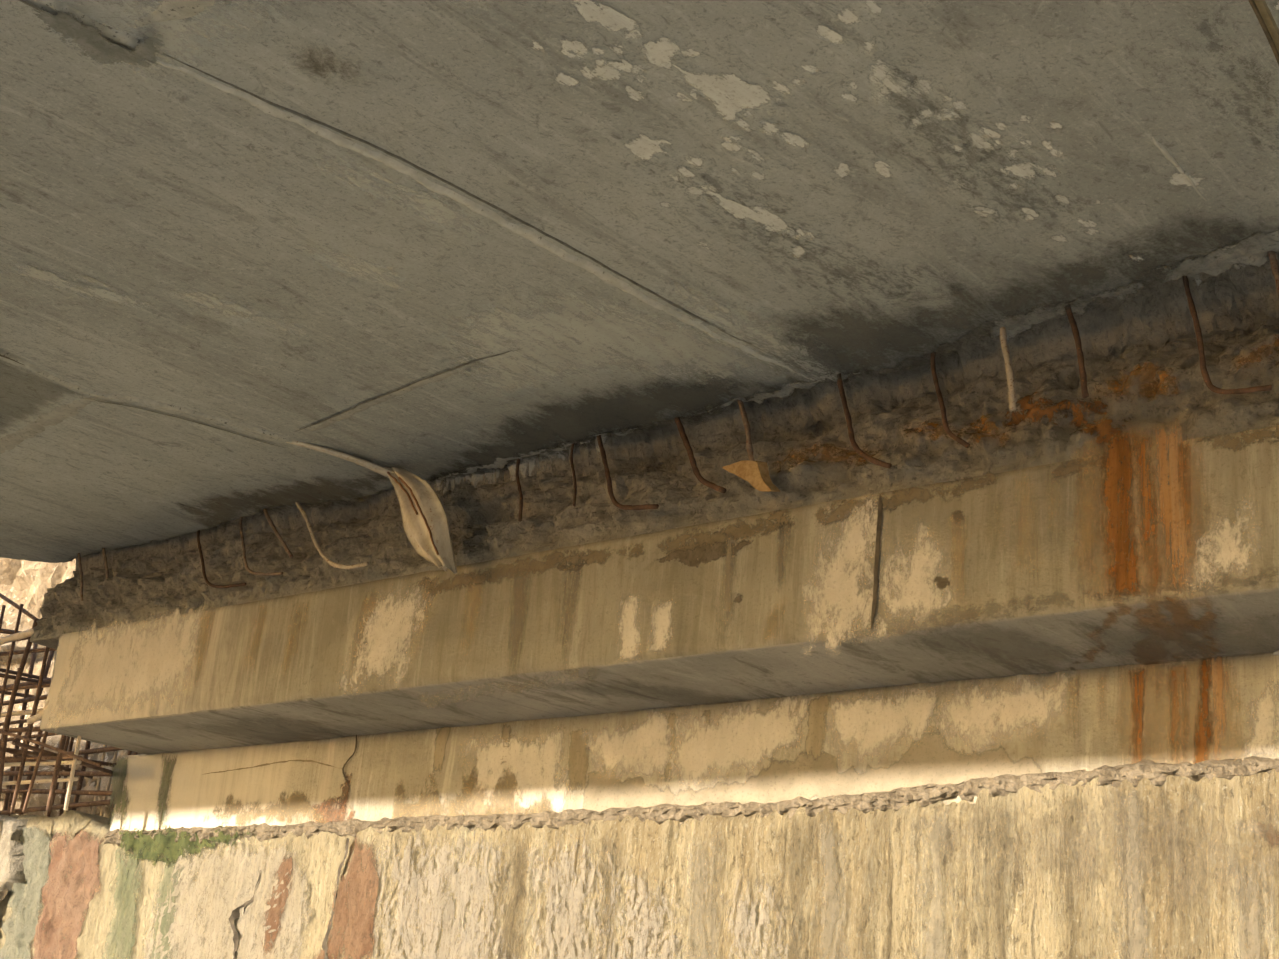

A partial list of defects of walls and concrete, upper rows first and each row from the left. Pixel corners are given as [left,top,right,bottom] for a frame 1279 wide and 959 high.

peeling [555,0,817,180]
peeling [668,155,815,257]
peeling [841,42,967,127]
peeling [953,115,1064,189]
spalling [30,229,1279,650]
water stain [803,499,952,649]
rust [902,392,1228,763]
water stain [392,672,1070,824]
water stain [0,827,311,959]
crack [202,735,357,959]
water stain [374,834,513,959]
water stain [528,838,791,959]